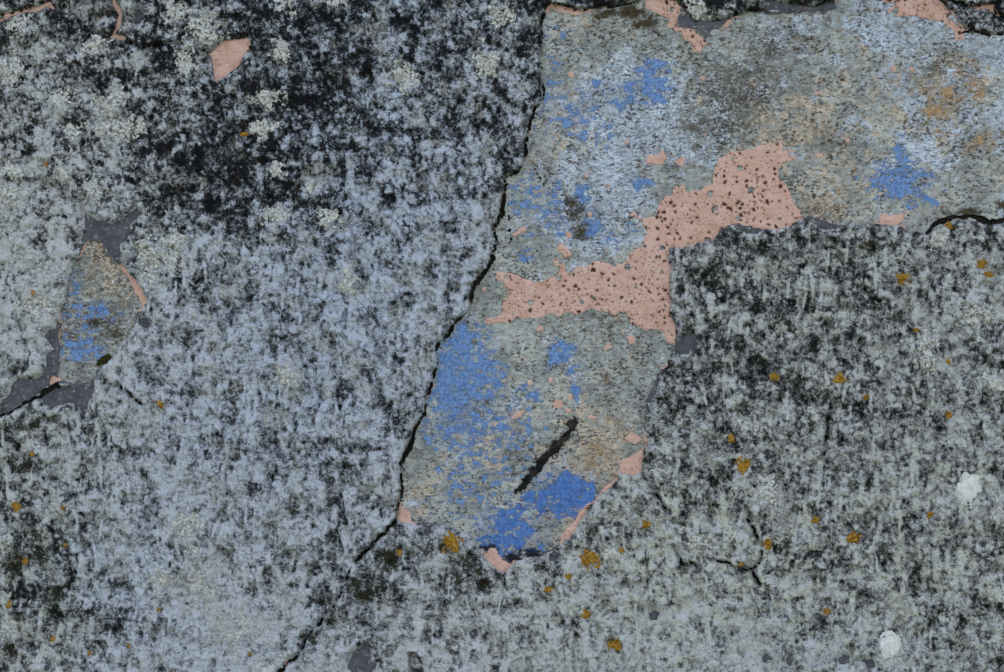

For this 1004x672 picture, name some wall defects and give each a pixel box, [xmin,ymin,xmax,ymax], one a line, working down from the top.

peeling [0,0,55,22]
peeling [208,37,251,83]
flaking render [0,208,151,416]
crack [277,1,635,672]
flaking render [391,0,1004,579]
crack [925,214,1004,235]